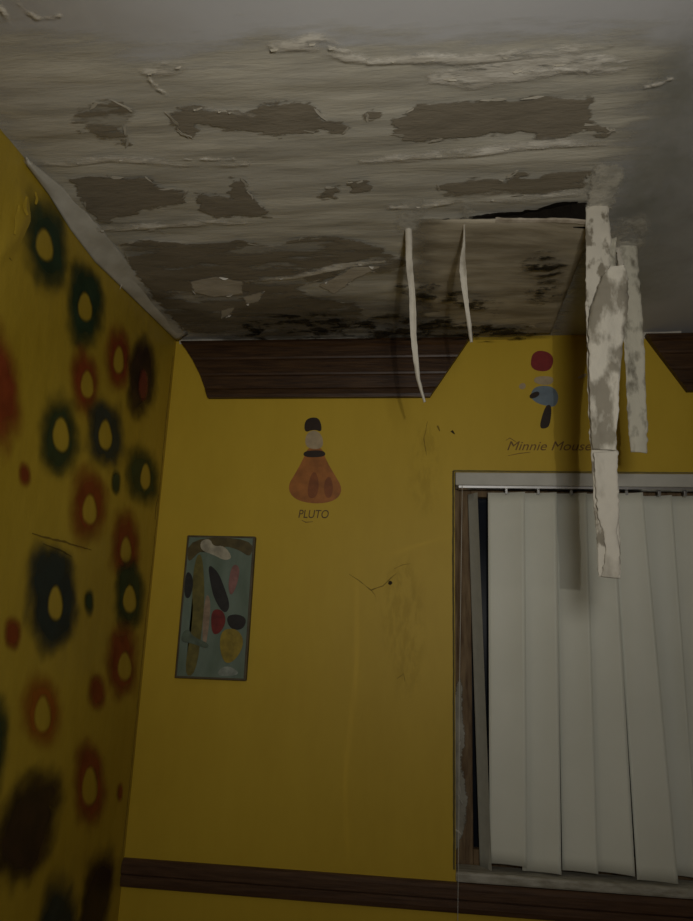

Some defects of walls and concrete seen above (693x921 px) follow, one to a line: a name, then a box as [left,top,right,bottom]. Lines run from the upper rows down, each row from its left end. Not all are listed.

flaking render [0,32,670,340]
water stain [396,284,487,310]
water stain [525,251,567,302]
water stain [243,314,536,342]